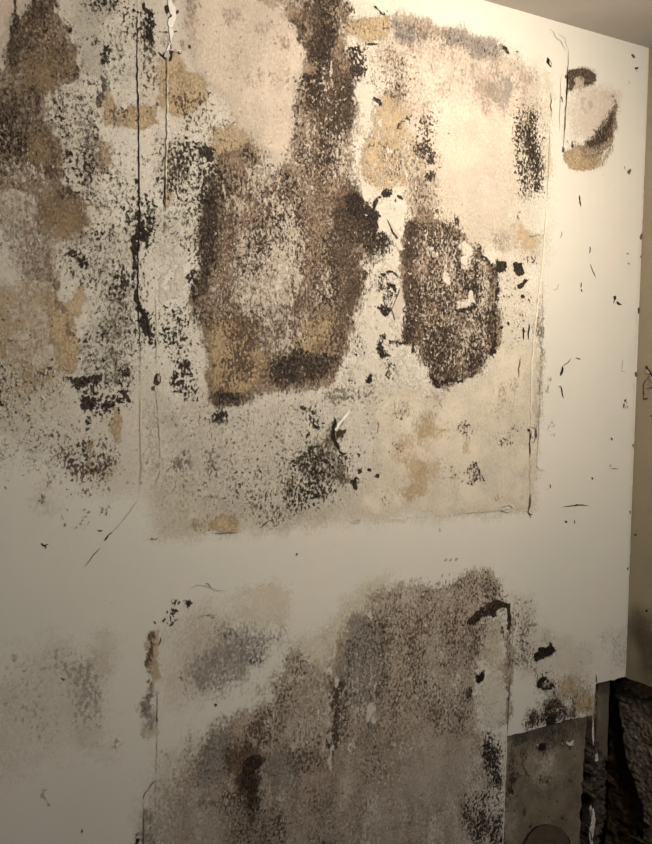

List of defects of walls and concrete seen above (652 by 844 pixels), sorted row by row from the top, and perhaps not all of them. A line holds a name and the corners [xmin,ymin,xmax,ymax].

crack [551,30,569,153]
damp [564,67,618,171]
crack [86,9,142,565]
damp [0,0,552,535]
damp [135,566,583,844]
spalling [609,677,632,704]
spalling [580,715,610,844]